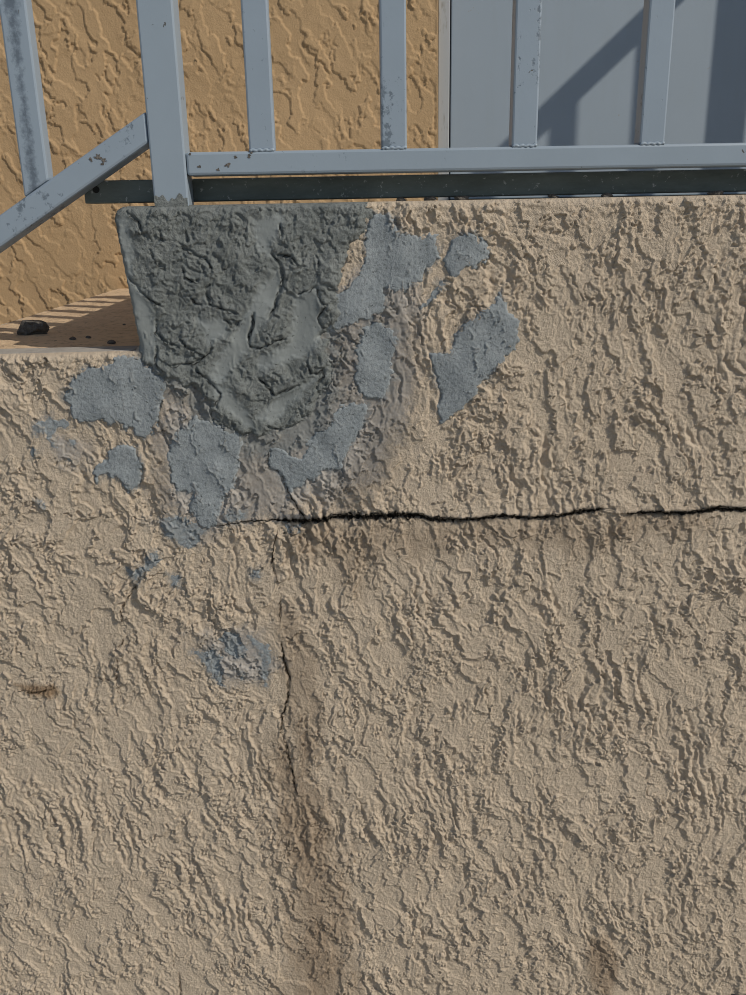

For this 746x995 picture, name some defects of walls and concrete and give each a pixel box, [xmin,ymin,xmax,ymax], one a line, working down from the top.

crack [627,505,746,516]
peeling [160,516,206,549]
crack [219,452,602,792]
peeling [194,650,225,687]